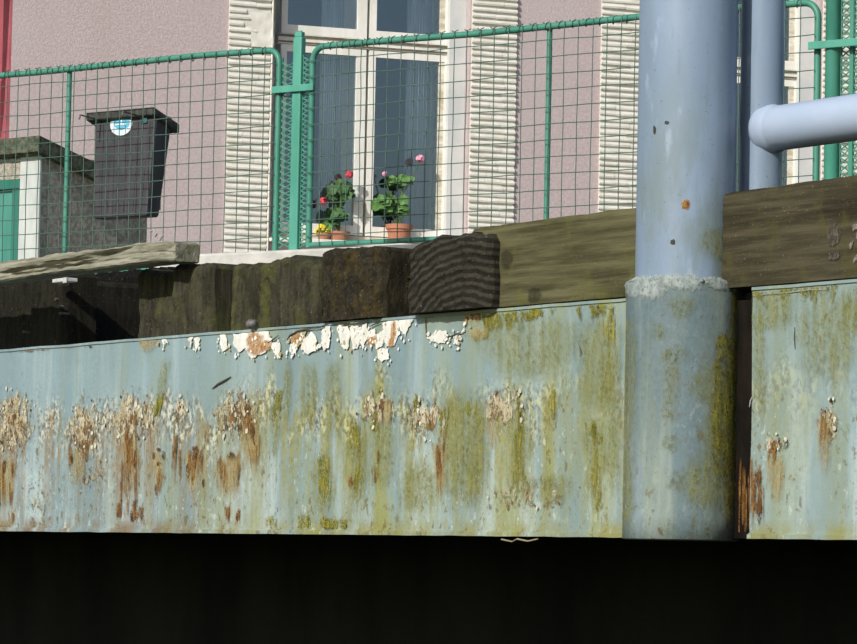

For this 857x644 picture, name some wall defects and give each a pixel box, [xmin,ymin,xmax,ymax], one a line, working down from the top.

peeling [217,319,416,366]
peeling [426,322,471,351]
water stain [470,308,552,340]
water stain [779,285,837,302]
corrosion [116,394,144,524]
corrosion [152,429,204,495]
corrosion [217,396,260,491]
water stain [317,455,346,529]
corrosion [435,433,445,492]
water stain [511,410,524,488]
water stain [711,293,741,520]
corrosion [738,441,782,532]